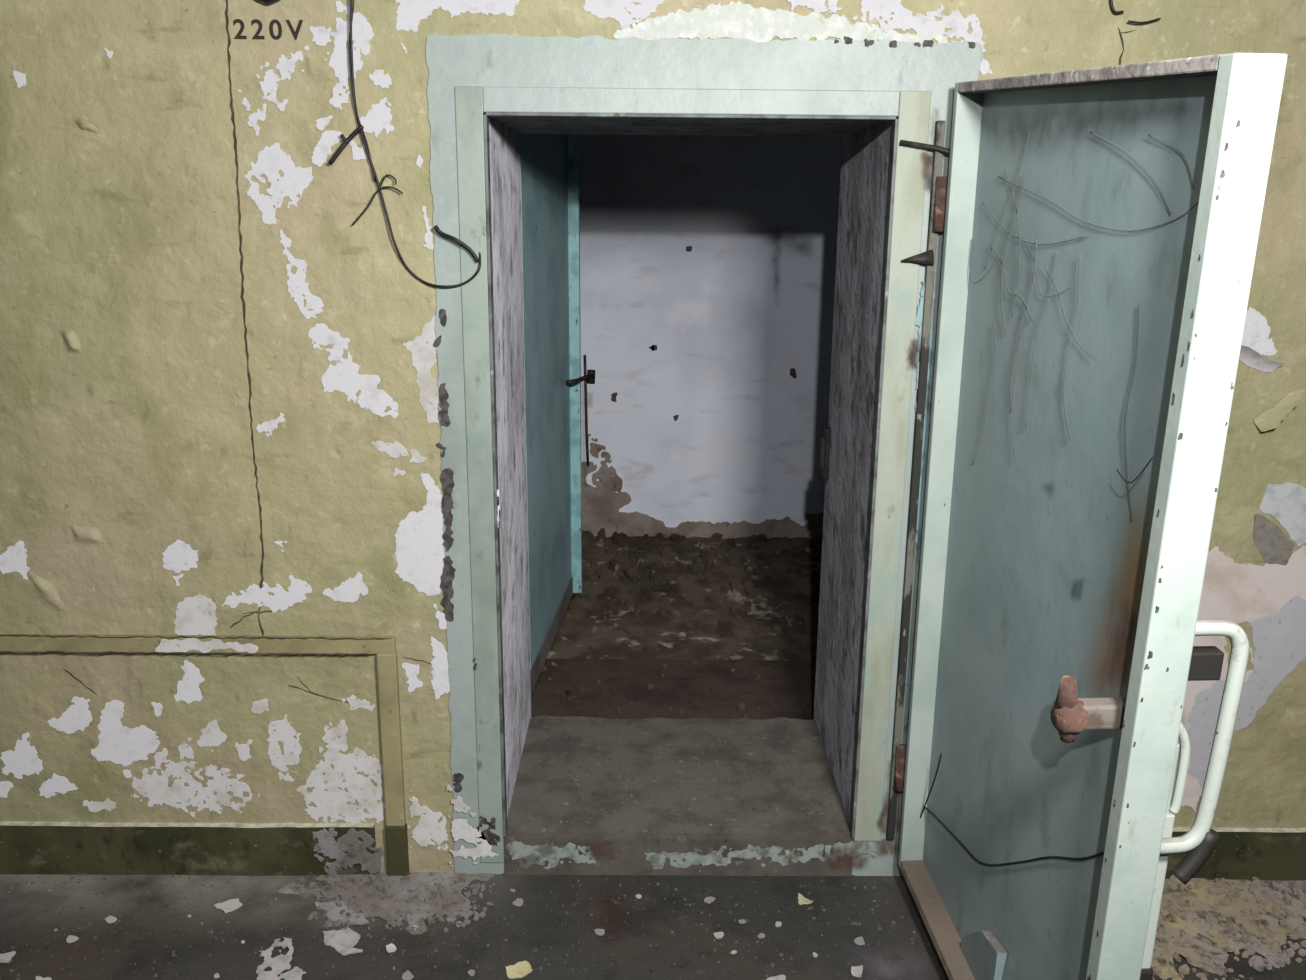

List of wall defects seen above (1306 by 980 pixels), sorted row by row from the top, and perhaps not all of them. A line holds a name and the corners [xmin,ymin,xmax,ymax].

peeling [393,0,520,53]
peeling [583,0,994,76]
crack [1118,27,1135,65]
peeling [233,1,399,419]
peeling [403,316,440,423]
peeling [1239,307,1284,372]
peeling [256,413,285,437]
peeling [0,541,30,580]
peeling [371,441,450,700]
peeling [1171,482,1306,811]
peeling [47,540,385,876]
peeling [0,732,116,813]